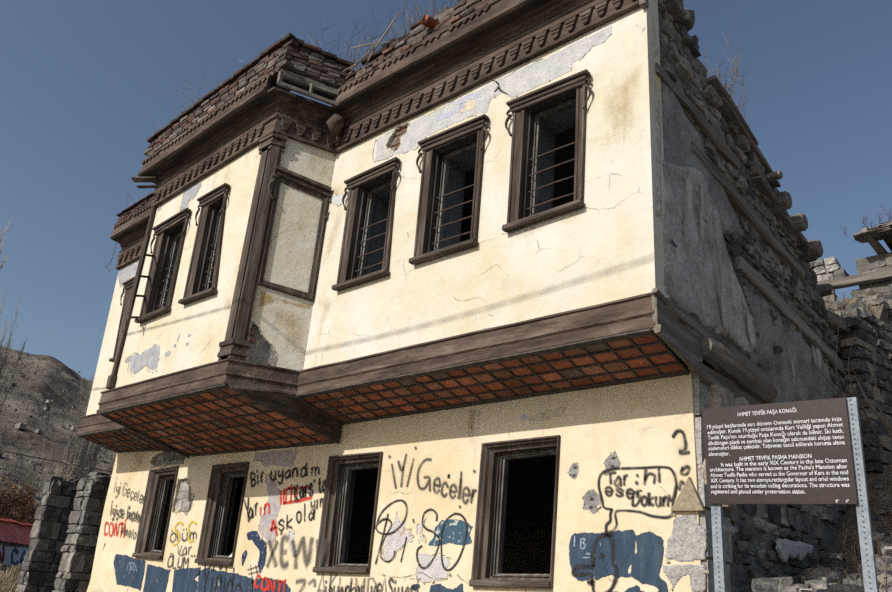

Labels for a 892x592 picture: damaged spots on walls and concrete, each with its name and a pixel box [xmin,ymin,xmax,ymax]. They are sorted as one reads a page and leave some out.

peeling [372,26,612,163]
peeling [125,334,191,375]
spalling [248,321,277,366]
spalling [172,477,194,516]
spalling [581,489,601,514]